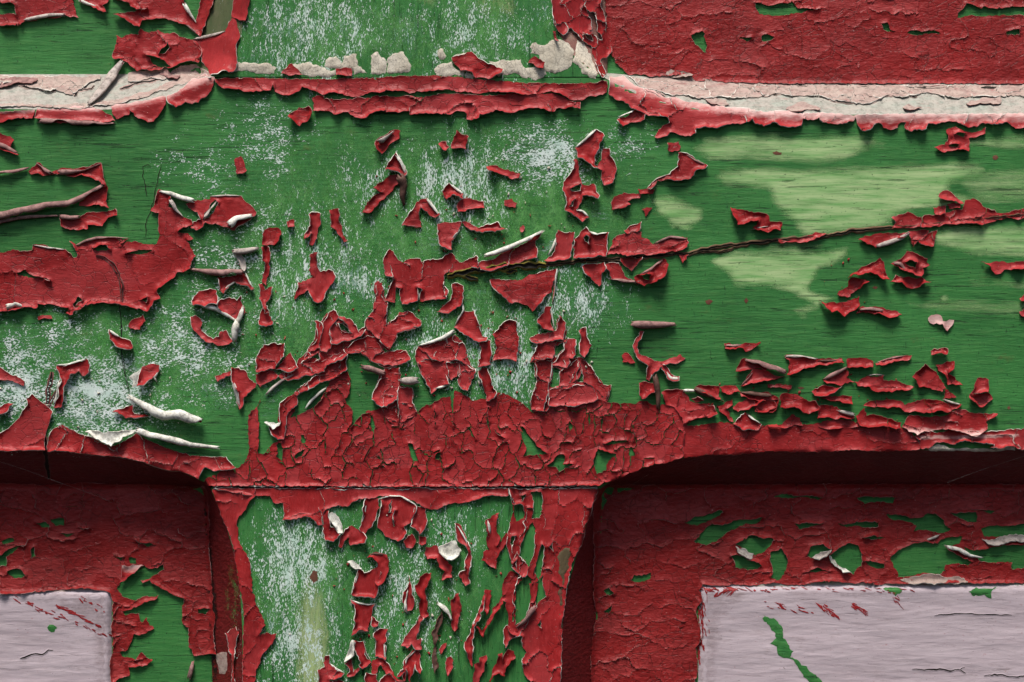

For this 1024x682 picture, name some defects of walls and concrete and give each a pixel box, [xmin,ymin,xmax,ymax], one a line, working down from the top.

peeling [0,0,1024,214]
crack [773,83,944,105]
peeling [0,162,347,350]
peeling [544,129,689,287]
crack [447,211,1024,282]
crack [213,483,597,491]
peeling [0,198,1024,682]